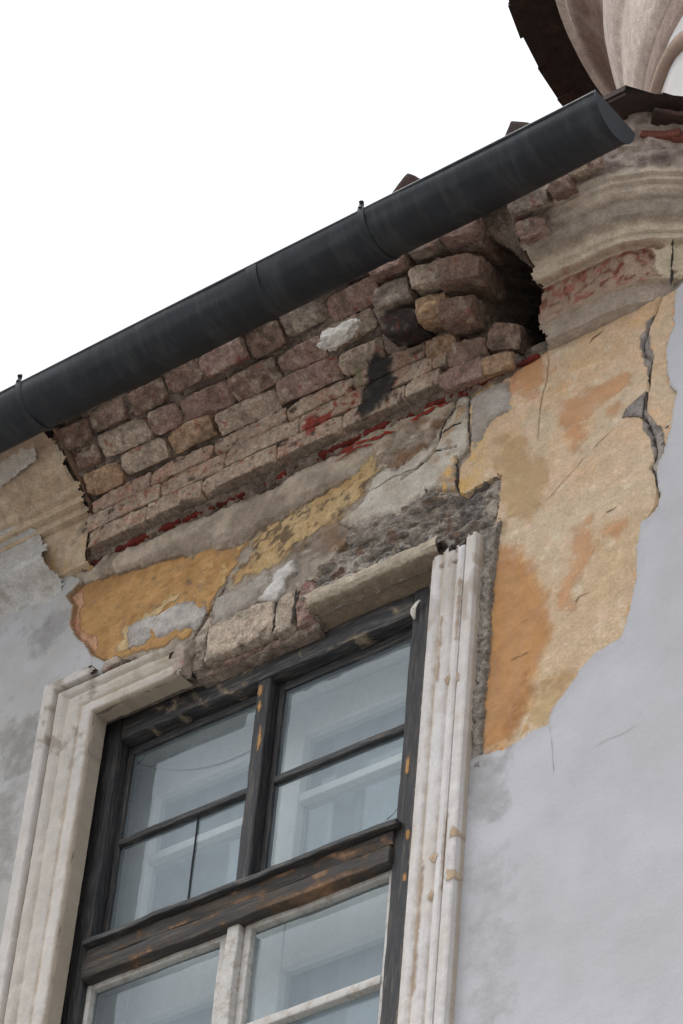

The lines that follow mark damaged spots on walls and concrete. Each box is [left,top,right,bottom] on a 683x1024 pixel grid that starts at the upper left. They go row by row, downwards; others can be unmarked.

flaking render [44,156,677,767]
crack [538,352,549,431]
crack [640,240,674,507]